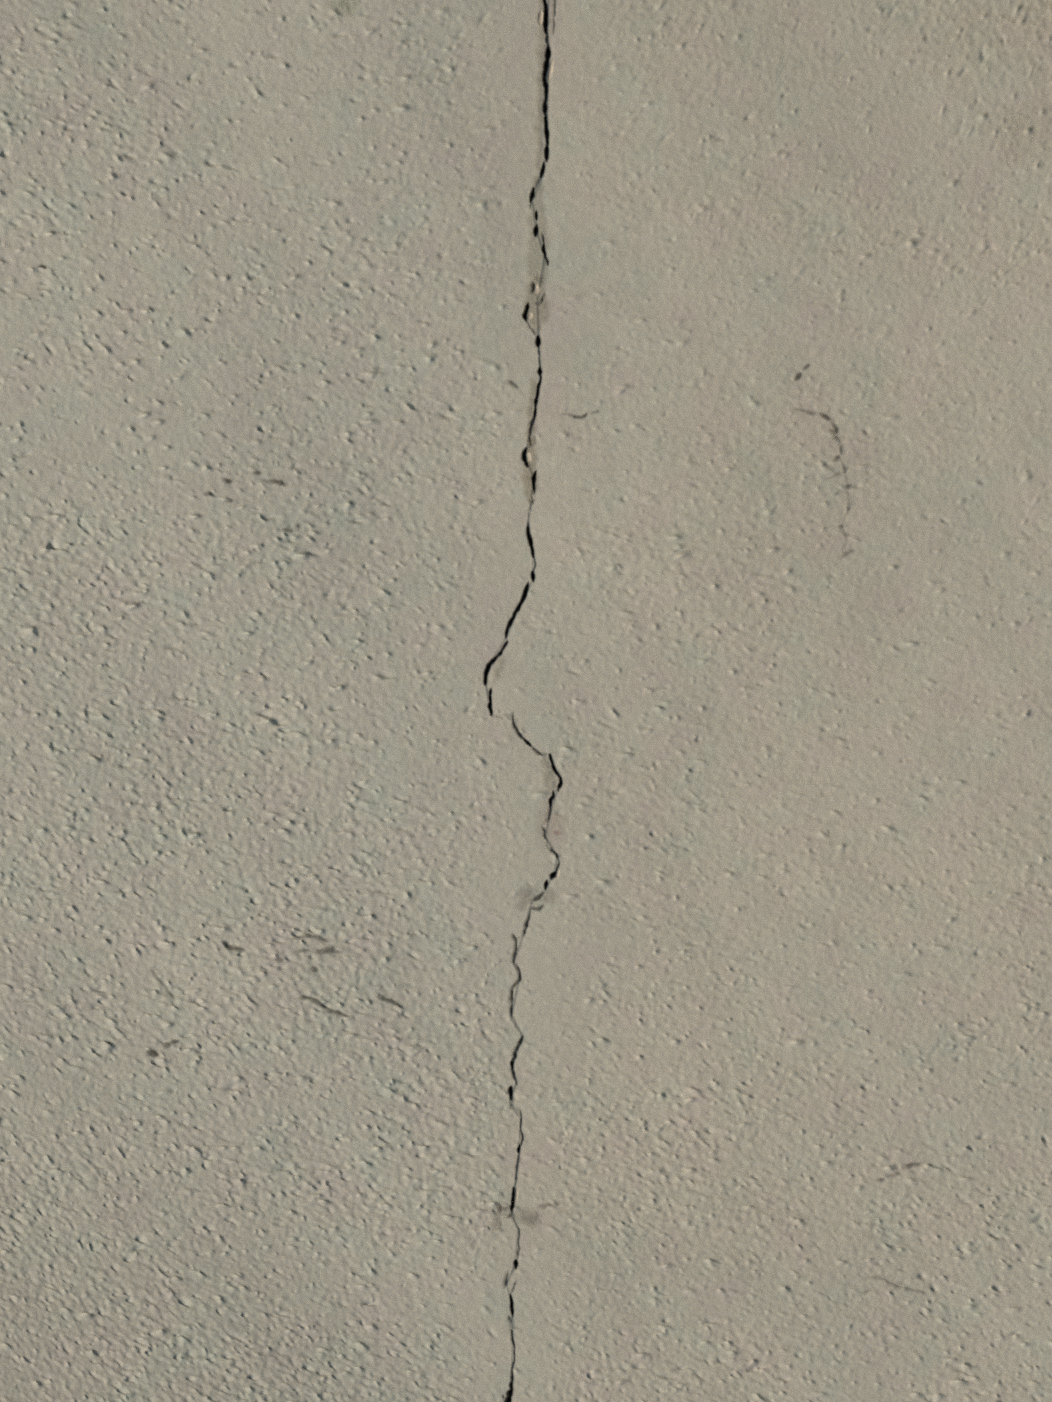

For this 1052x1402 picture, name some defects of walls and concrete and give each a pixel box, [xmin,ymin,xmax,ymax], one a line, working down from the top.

crack [483,0,562,807]
crack [508,849,560,1100]
crack [510,1187,518,1210]
crack [504,1260,518,1402]